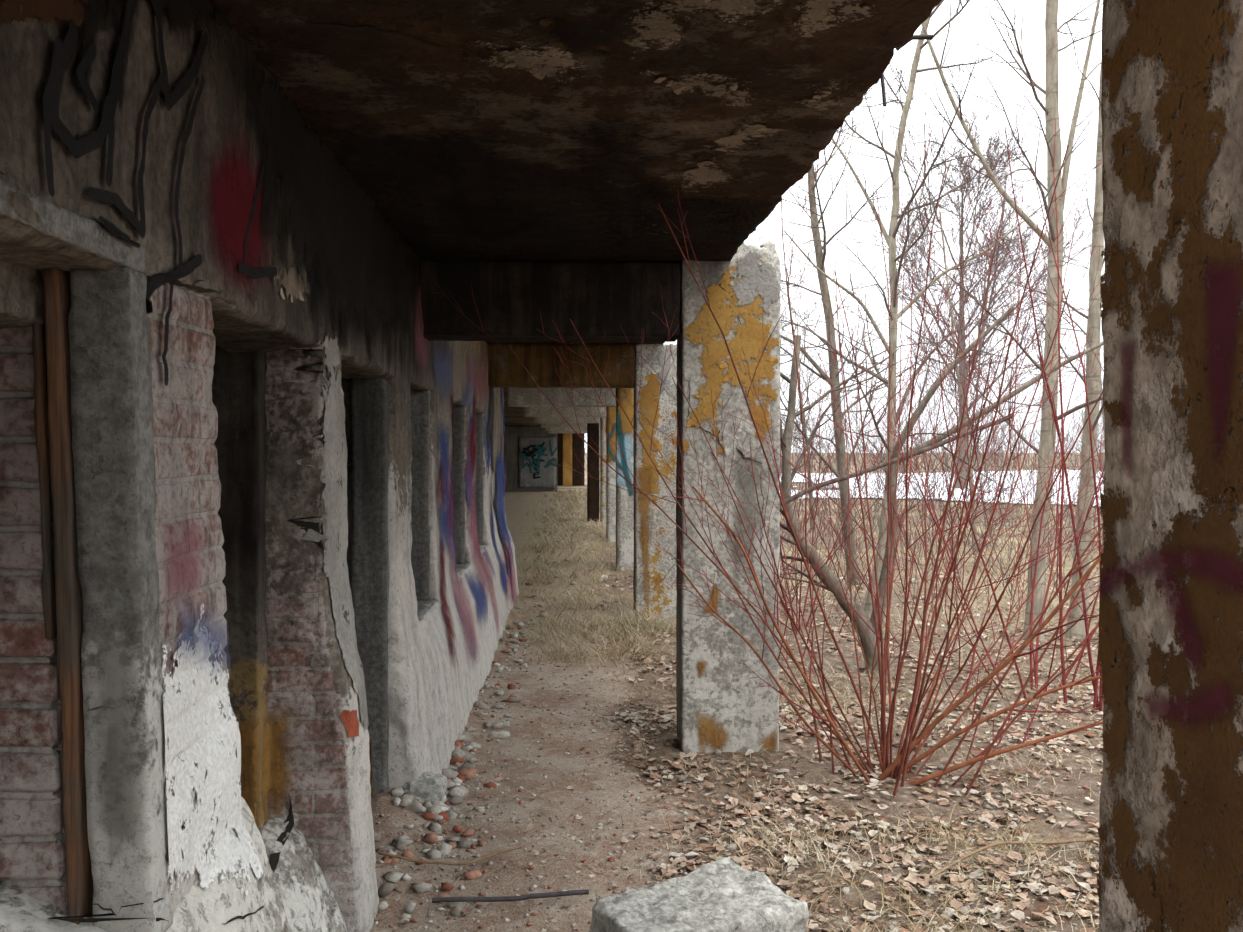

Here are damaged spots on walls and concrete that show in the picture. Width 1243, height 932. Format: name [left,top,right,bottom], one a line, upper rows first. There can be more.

peeling [475,32,587,84]
peeling [615,0,877,192]
peeling [618,250,780,494]
peeling [1097,0,1243,932]
crack [224,793,294,924]